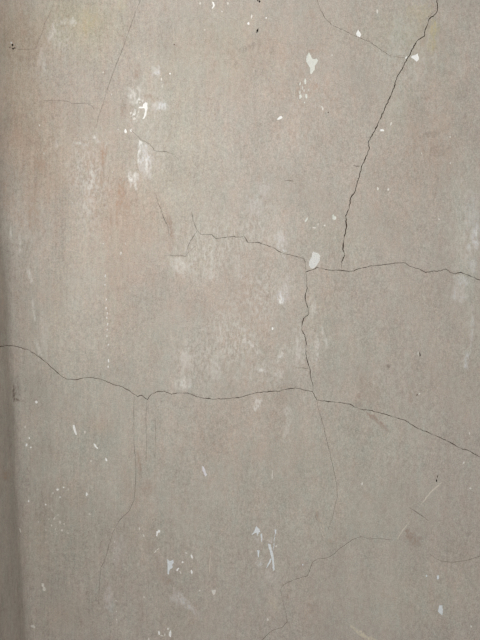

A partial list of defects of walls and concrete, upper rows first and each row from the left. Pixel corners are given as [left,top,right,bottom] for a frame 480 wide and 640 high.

crack [45,0,141,127]
peeling [299,53,318,103]
crack [317,0,439,267]
crack [0,214,480,529]
crack [98,403,136,591]
peeling [252,526,277,571]
crack [262,536,392,640]